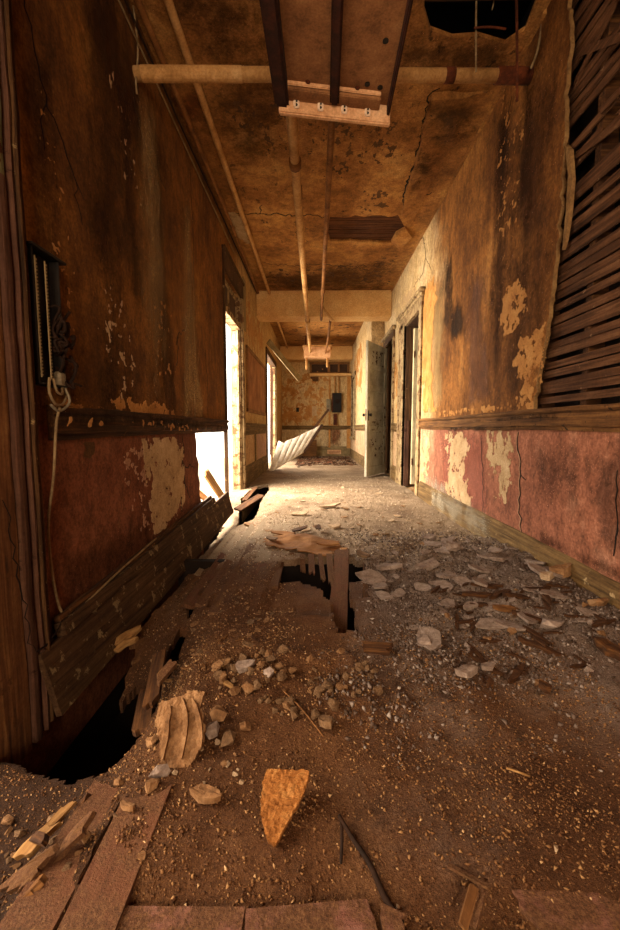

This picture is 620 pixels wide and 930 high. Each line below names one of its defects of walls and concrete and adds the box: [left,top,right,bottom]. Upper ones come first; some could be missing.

crack [402,88,440,205]
flaking render [397,0,620,417]
peeling [98,287,198,535]
peeling [444,431,473,506]
peeling [486,430,514,504]
crack [516,432,526,532]